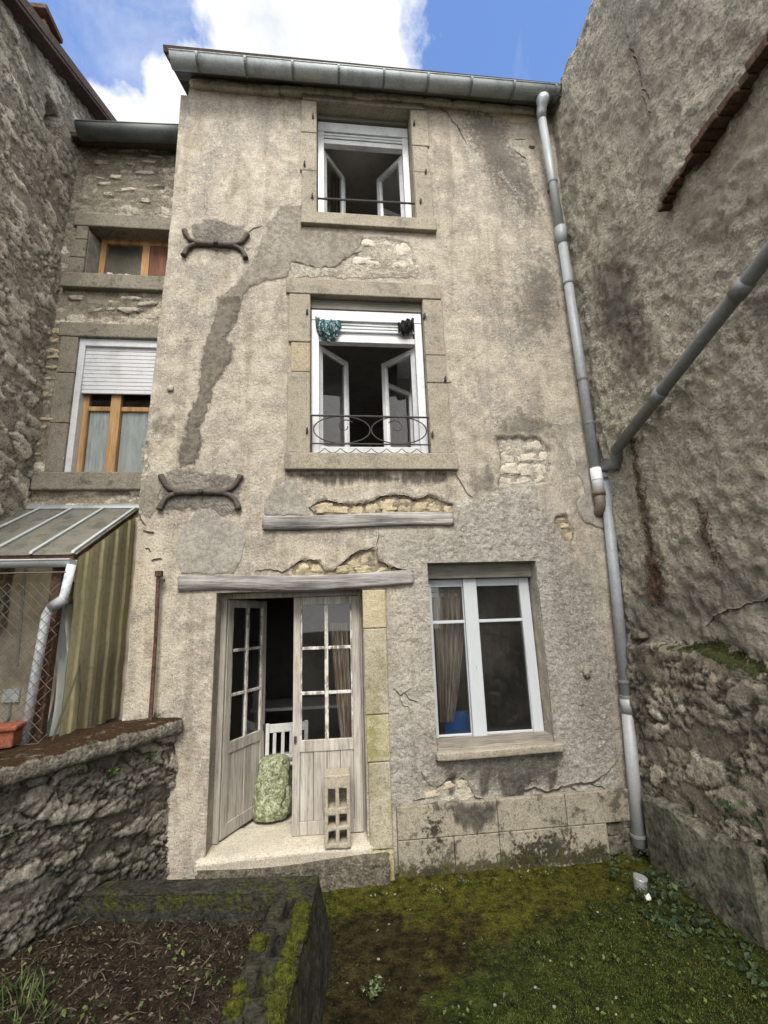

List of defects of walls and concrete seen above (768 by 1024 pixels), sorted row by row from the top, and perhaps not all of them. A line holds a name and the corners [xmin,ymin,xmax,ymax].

flaking render [290,237,418,279]
flaking render [497,436,551,486]
flaking render [314,495,453,516]
flaking render [555,516,575,542]
rust [630,435,669,607]
flaking render [291,550,395,575]
crack [706,598,768,626]
crack [393,688,418,709]
flaking render [421,777,474,801]
crack [413,759,619,801]
water stain [422,773,531,854]
mould [509,828,578,864]